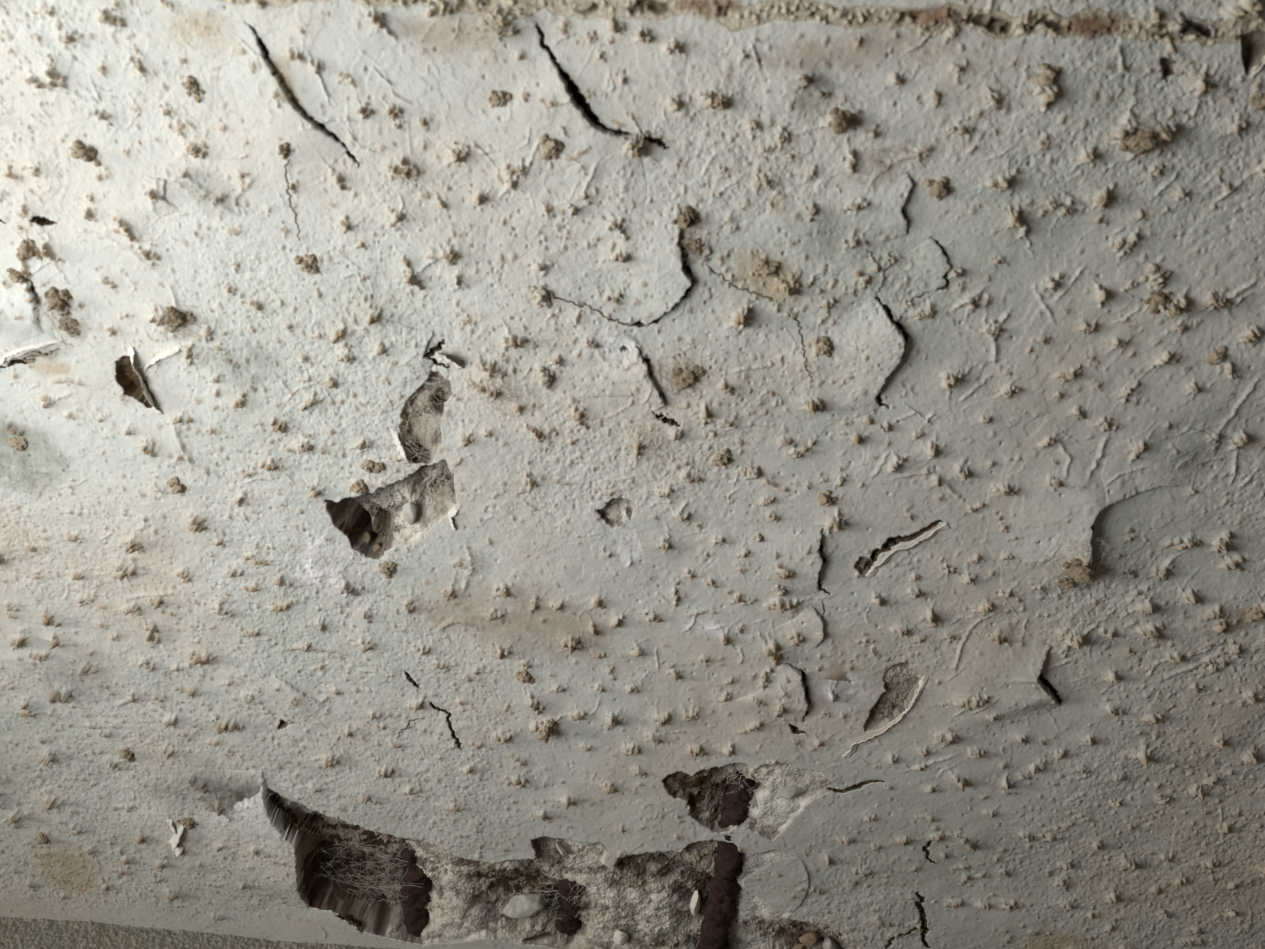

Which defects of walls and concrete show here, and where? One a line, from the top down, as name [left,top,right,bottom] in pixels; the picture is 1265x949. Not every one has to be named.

crack [245,22,360,168]
crack [535,22,670,149]
spalling [115,346,180,415]
spalling [324,353,464,559]
peeling [854,522,951,577]
spalling [842,645,930,758]
spalling [266,762,862,949]